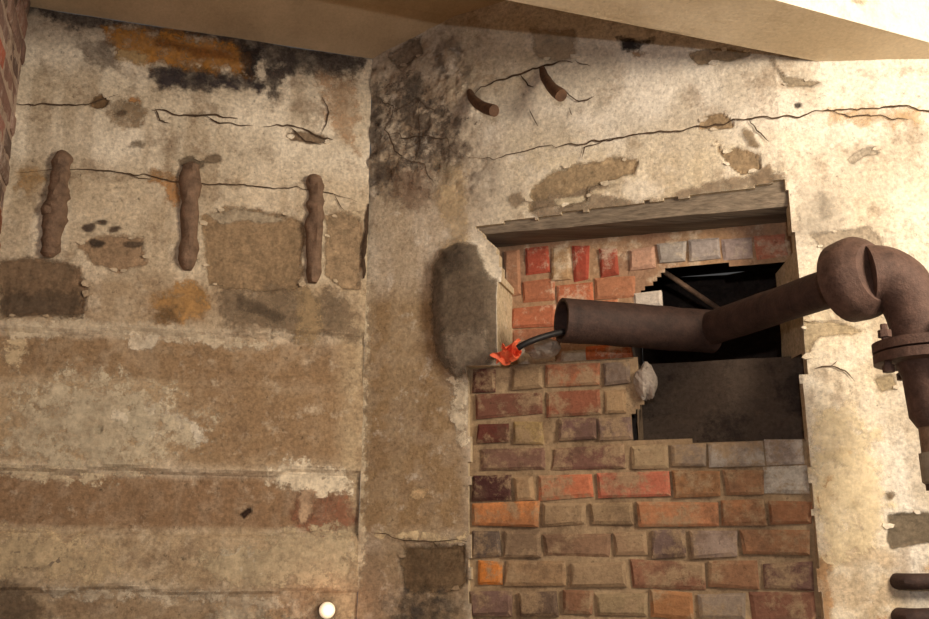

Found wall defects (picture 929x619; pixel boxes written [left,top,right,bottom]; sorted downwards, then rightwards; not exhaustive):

damp [143,25,366,98]
crack [475,60,589,93]
rust [18,150,73,258]
spalling [0,256,93,318]
rust [148,161,211,324]
crack [152,98,333,145]
spalling [199,206,306,292]
rust [304,174,325,284]
damp [369,70,480,249]
spalling [509,157,638,211]
crack [379,97,929,182]
damp [0,366,470,619]